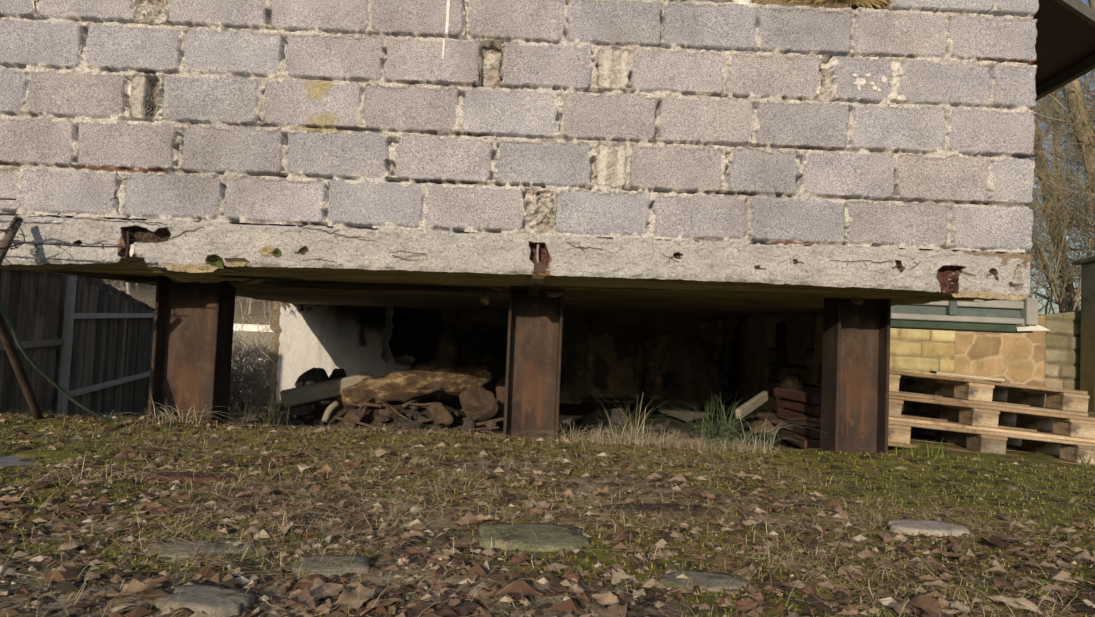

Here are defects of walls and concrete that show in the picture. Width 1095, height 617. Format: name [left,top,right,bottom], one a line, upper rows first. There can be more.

spalling [117,225,171,258]